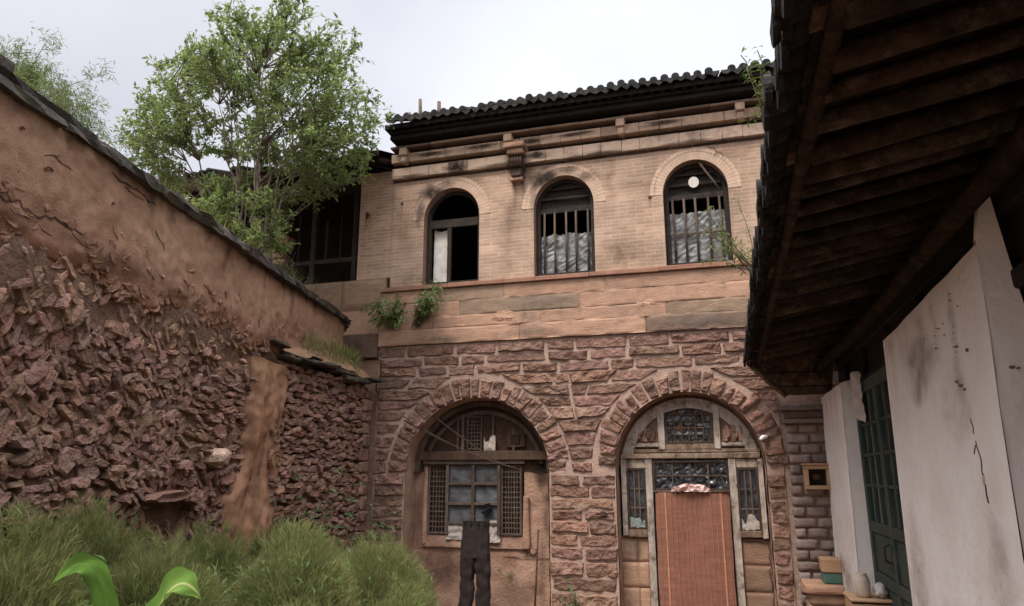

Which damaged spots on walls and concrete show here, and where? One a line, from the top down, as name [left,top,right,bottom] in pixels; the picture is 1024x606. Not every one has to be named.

crack [0,187,94,250]
crack [112,172,164,247]
crack [970,418,989,503]